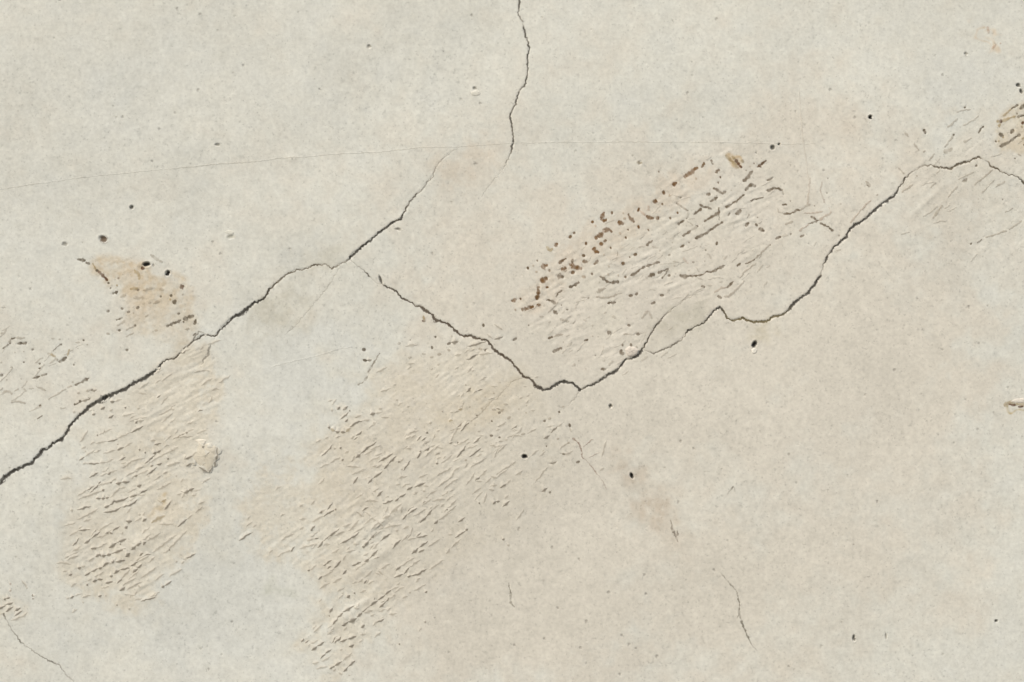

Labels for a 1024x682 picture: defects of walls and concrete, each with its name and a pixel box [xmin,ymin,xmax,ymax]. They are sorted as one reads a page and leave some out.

flaking render [0,128,842,682]
crack [0,0,1024,490]
corrosion [510,149,744,320]